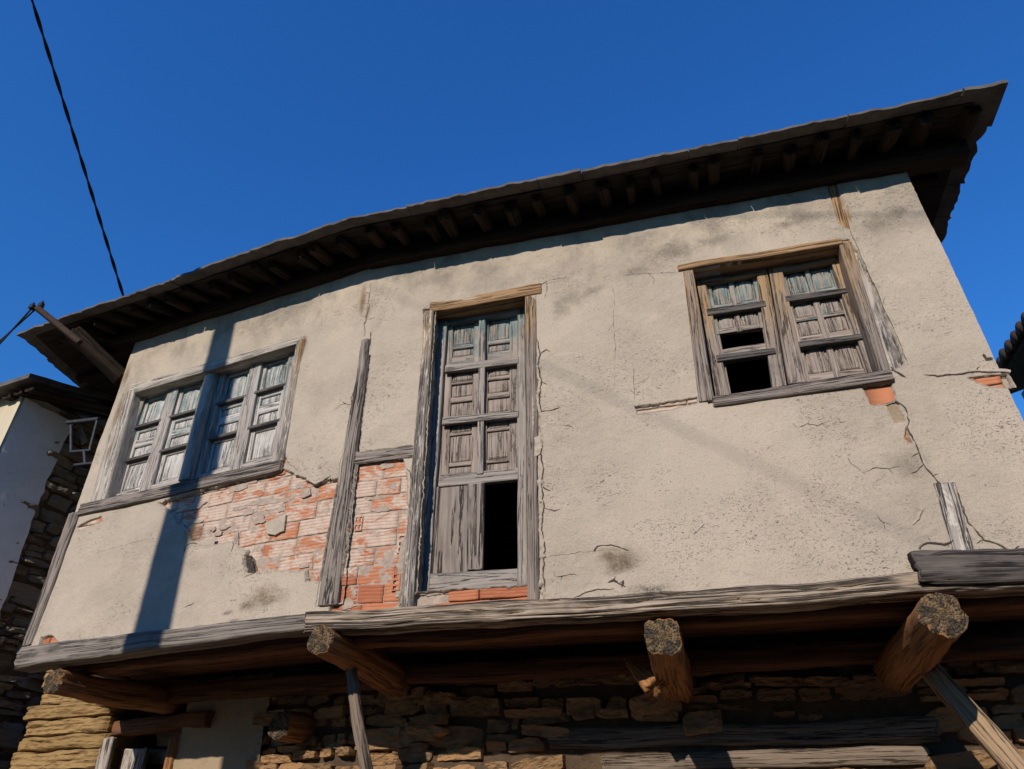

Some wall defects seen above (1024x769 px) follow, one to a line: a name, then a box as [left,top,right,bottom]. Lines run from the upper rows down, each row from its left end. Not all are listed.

spalling [76,516,103,532]
spalling [157,308,546,611]
crack [536,341,570,426]
crack [538,452,636,598]
spalling [827,183,913,444]
crack [846,231,1019,549]
spalling [966,373,1016,390]